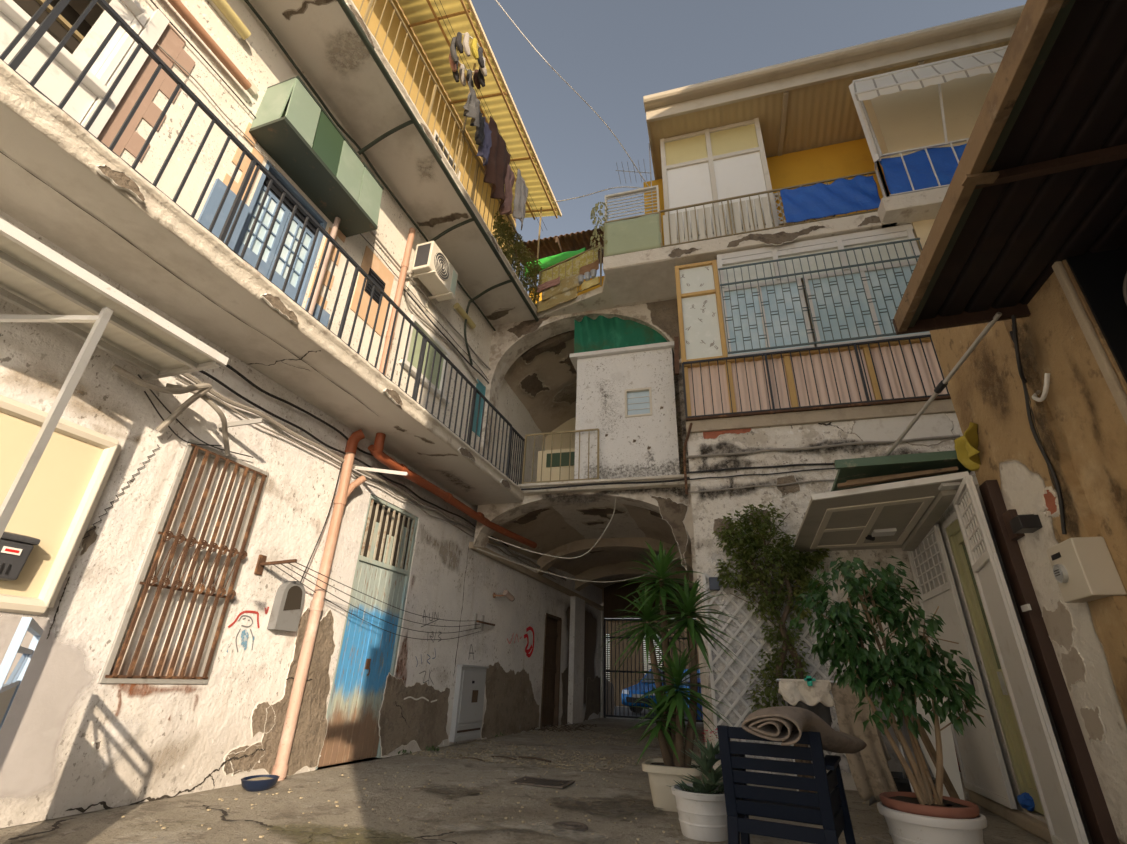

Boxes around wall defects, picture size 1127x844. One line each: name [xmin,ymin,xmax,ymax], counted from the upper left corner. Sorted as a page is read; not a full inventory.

spalling [282,0,375,48]
spalling [95,165,146,204]
spalling [726,225,833,248]
crack [0,151,378,416]
spalling [260,293,300,324]
flaking render [486,307,577,405]
spalling [1041,486,1060,518]
crack [47,576,70,639]
peeling [1042,599,1087,693]
spalling [222,607,309,777]
crack [8,748,385,844]
crack [415,831,457,844]